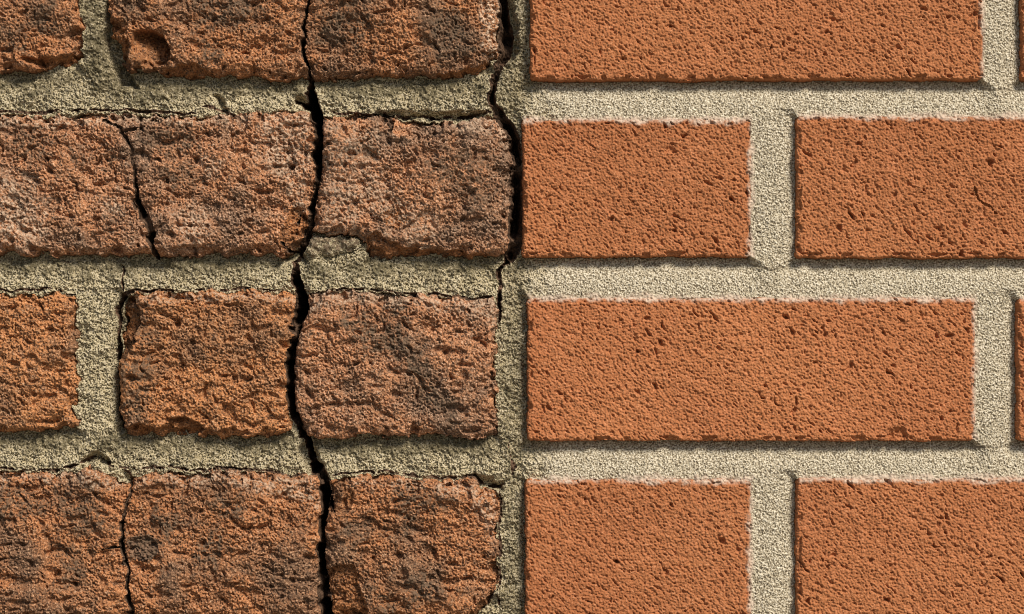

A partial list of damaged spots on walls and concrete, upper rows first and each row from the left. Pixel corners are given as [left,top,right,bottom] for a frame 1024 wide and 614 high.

crack [0,0,523,614]